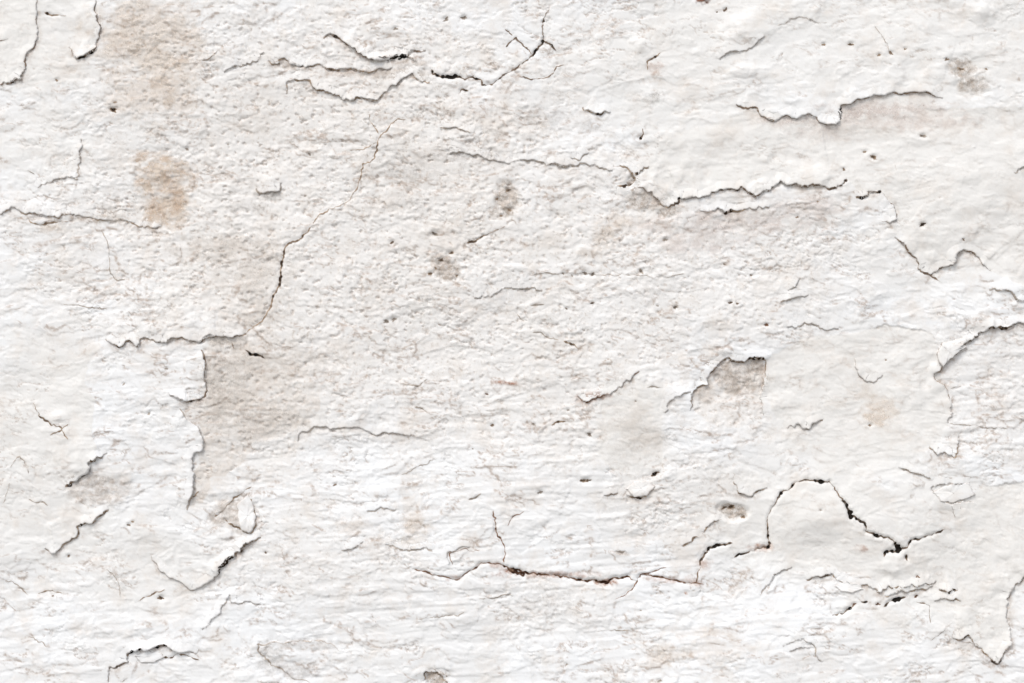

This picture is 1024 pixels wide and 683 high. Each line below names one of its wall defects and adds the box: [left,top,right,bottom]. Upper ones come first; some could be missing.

peeling [0,0,38,85]
peeling [69,0,102,59]
peeling [220,26,430,101]
crack [431,10,562,92]
peeling [736,83,944,125]
crack [232,114,406,359]
peeling [440,118,1024,423]
peeling [105,327,246,510]
peeling [62,447,107,487]
peeling [45,504,109,557]
peeling [151,487,261,591]
crack [415,479,944,619]